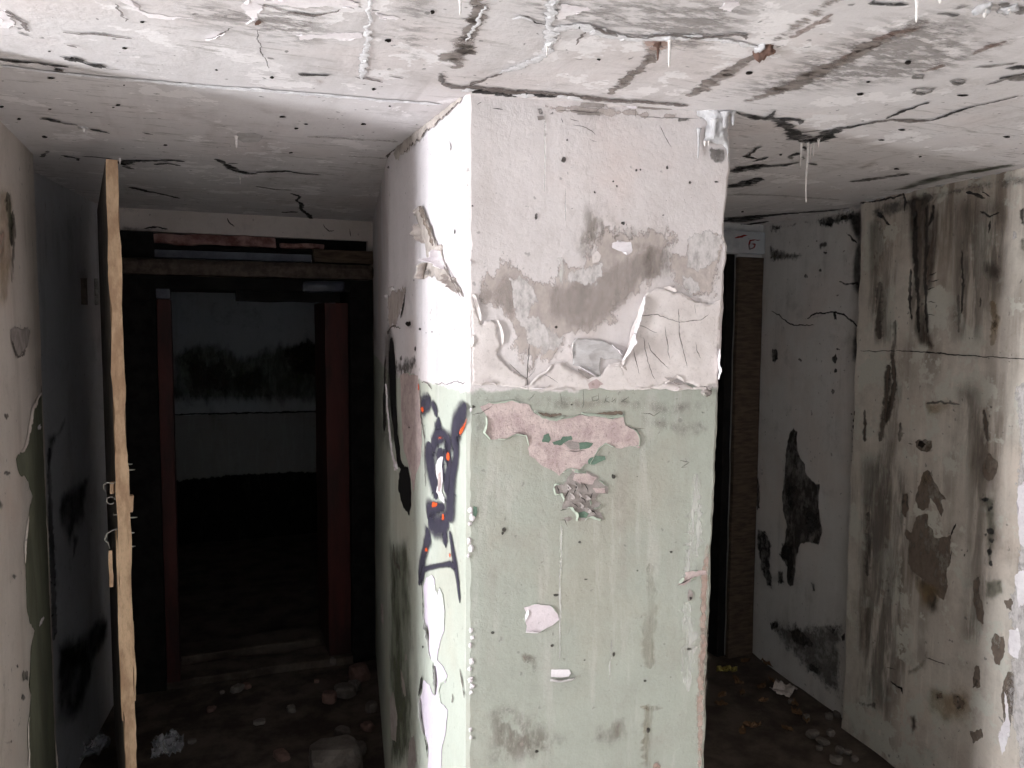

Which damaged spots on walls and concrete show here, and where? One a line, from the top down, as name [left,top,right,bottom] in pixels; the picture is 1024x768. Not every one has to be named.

flaking render [409,205,724,525]
spalling [467,506,477,558]